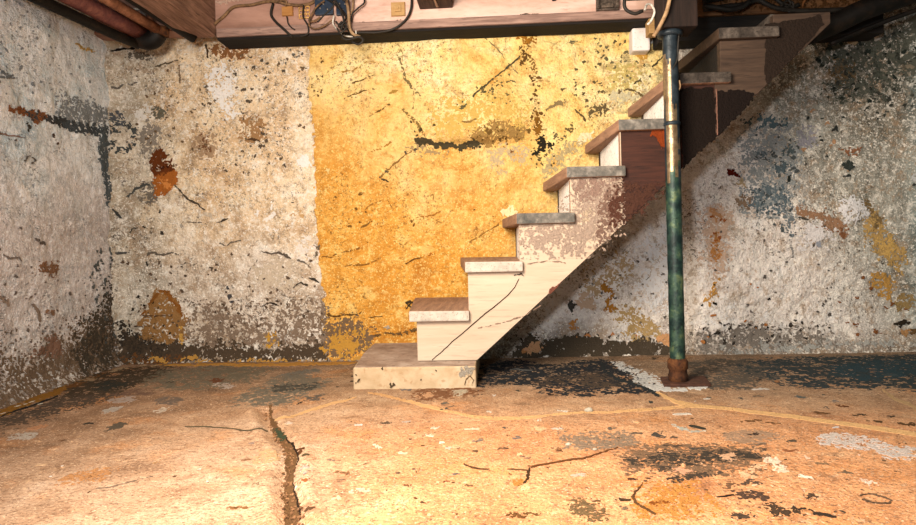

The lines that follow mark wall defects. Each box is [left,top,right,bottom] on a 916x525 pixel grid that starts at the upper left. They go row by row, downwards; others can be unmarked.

spalling [586,103,609,118]
rust [149,146,178,198]
crack [248,38,522,288]
crack [174,185,241,246]
damp [0,247,335,441]
spalling [521,341,546,356]
damp [400,176,916,426]
spalling [656,334,669,347]
spalling [893,319,911,339]
crack [185,405,301,525]
damp [557,419,846,521]
damp [484,497,609,522]